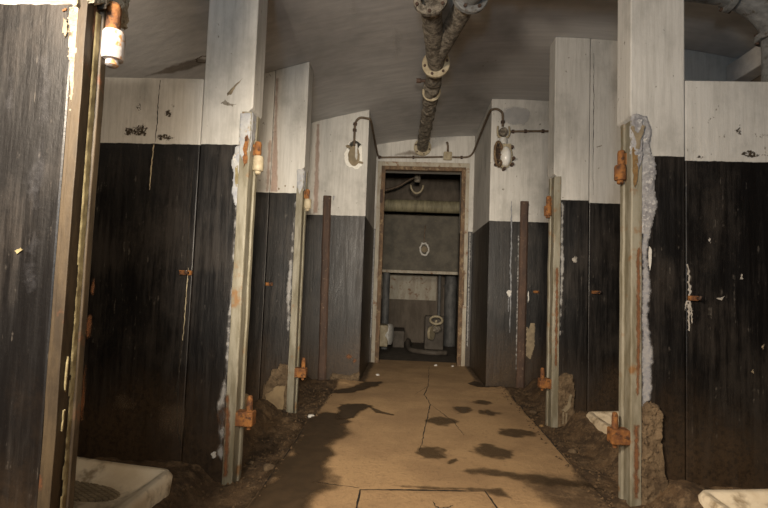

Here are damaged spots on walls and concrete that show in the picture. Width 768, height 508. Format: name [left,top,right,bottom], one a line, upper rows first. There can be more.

crack [149,80,161,190]
peeling [221,100,257,205]
peeling [60,0,130,508]
spalling [630,113,669,505]
spalling [262,364,288,411]
crack [417,370,464,447]